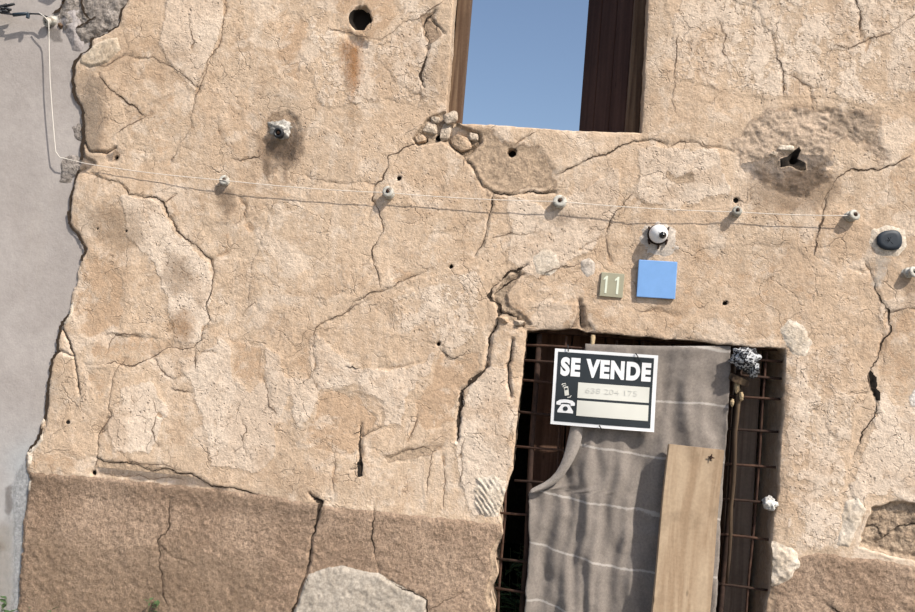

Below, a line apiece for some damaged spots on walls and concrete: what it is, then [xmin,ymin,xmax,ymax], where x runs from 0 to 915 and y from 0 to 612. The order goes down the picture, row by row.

spalling [58,0,128,68]
crack [330,1,443,107]
crack [833,0,915,57]
crack [28,0,267,494]
crack [309,143,419,389]
spalling [412,111,557,196]
crack [449,137,731,255]
crack [814,156,910,255]
crack [394,194,632,507]
crack [827,265,915,456]
crack [291,425,379,612]
spalling [837,498,915,561]